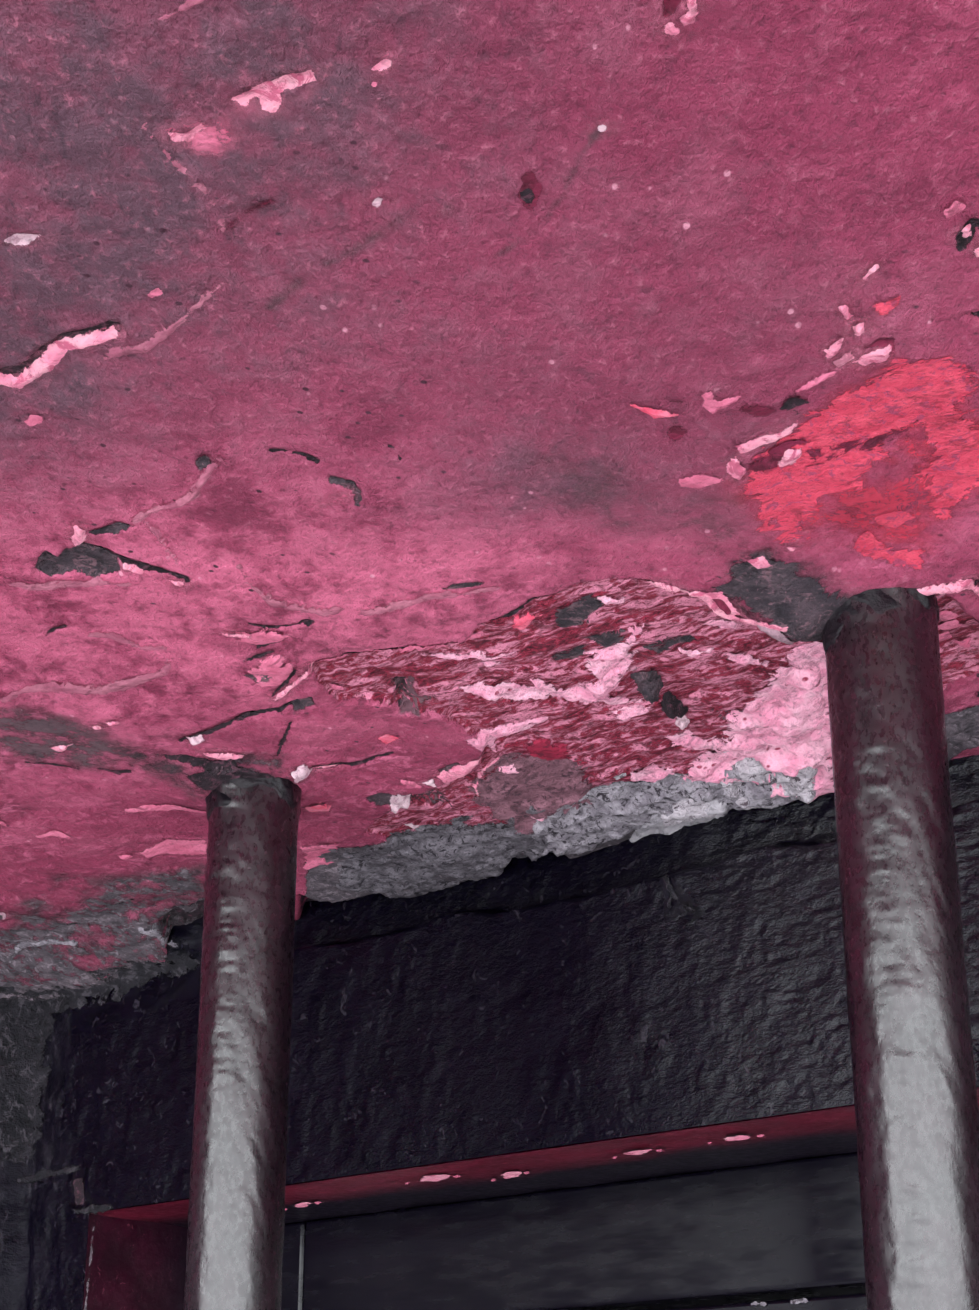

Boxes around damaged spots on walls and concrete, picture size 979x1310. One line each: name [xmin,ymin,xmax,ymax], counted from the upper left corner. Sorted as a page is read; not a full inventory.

spalling [663,0,698,36]
peeling [232,69,317,113]
peeling [165,122,231,153]
spalling [943,201,979,257]
peeling [0,320,122,389]
peeling [24,415,43,427]
peeling [630,296,979,569]
spalling [917,577,979,691]
spalling [222,578,834,838]
peeling [125,804,206,814]
peeling [119,839,207,860]
peeling [299,843,340,870]